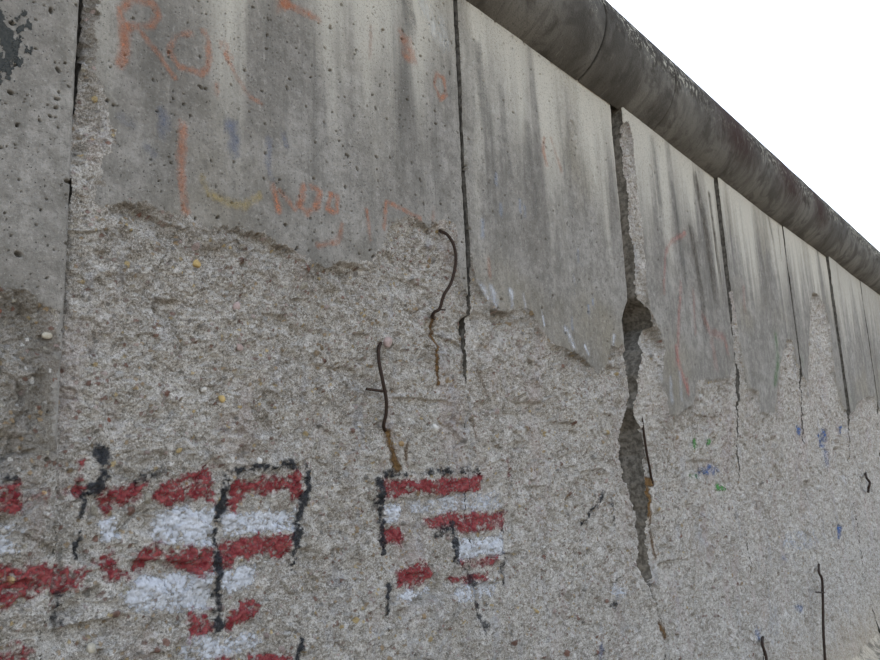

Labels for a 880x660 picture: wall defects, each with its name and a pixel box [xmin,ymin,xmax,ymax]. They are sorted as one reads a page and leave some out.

spalling [0,0,476,660]
corrosion [384,429,408,472]
corrosion [428,316,440,386]
spalling [464,121,880,660]